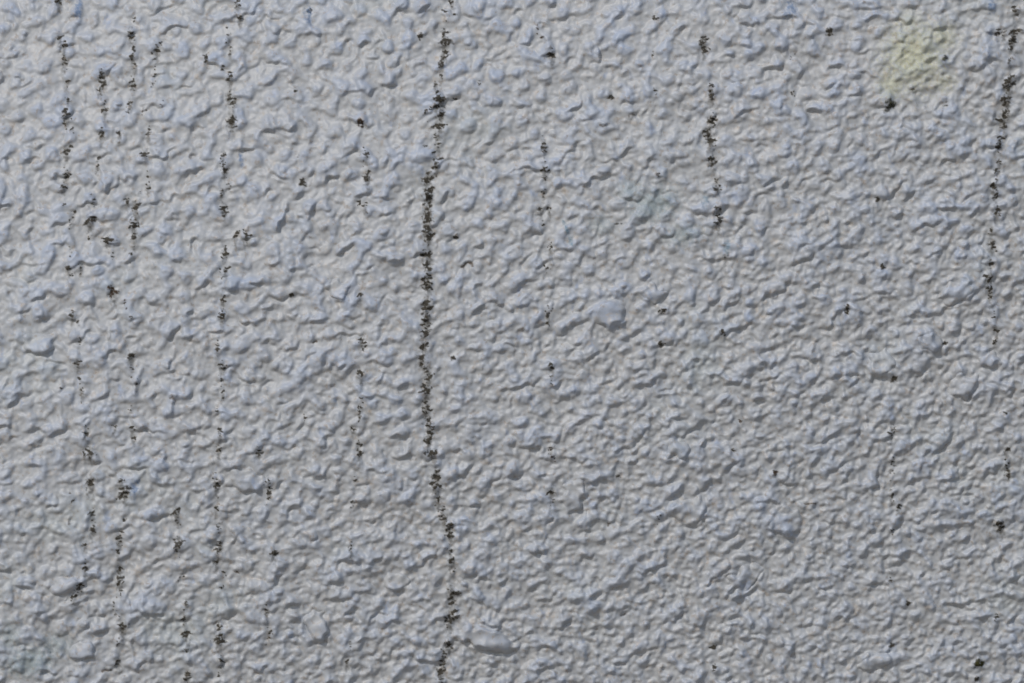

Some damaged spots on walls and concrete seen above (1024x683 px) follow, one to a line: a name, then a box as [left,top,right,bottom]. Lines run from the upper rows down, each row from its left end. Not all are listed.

water stain [221,27,237,128]
water stain [61,98,74,188]
water stain [703,118,722,191]
water stain [990,75,1016,216]
water stain [62,194,114,257]
water stain [418,28,457,457]
water stain [429,470,455,572]
water stain [113,518,127,630]
water stain [444,589,461,628]